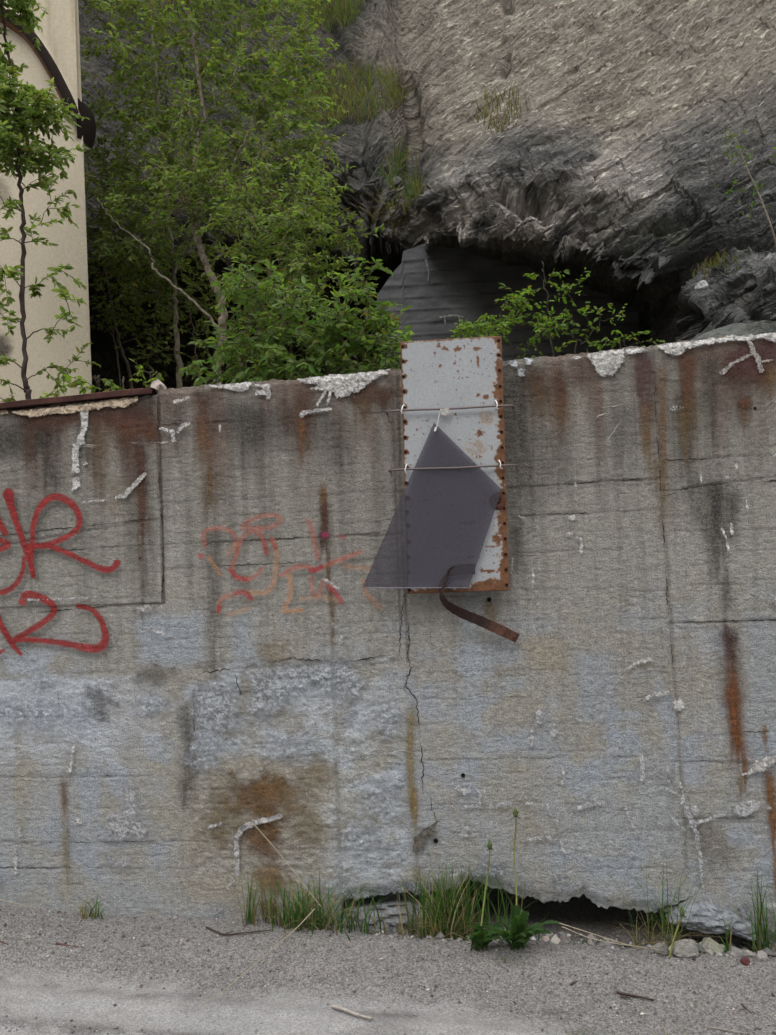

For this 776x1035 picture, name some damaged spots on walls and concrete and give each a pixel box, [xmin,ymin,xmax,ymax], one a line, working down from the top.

water stain [0,396,138,479]
crack [192,604,437,820]
rust [723,625,747,792]
rust [210,772,317,891]
peeling [659,762,771,888]
rust [766,774,776,889]